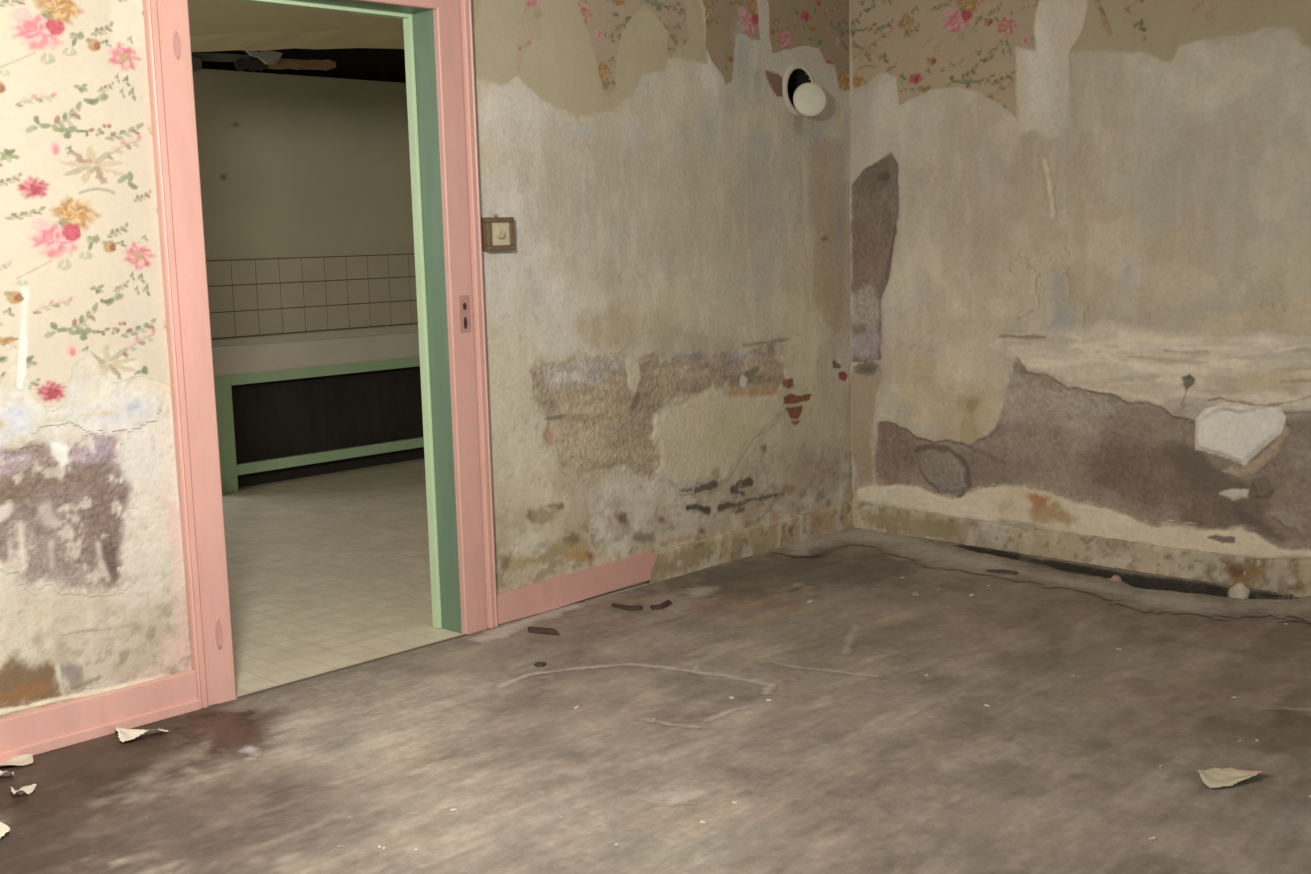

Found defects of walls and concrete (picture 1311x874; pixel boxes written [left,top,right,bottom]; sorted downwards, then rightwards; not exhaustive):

peeling [764,70,784,99]
peeling [1013,0,1090,135]
spalling [883,223,898,283]
spalling [0,430,139,597]
spalling [526,336,812,487]
spalling [675,475,782,518]
flaking render [831,358,848,383]
spalling [874,315,1311,550]